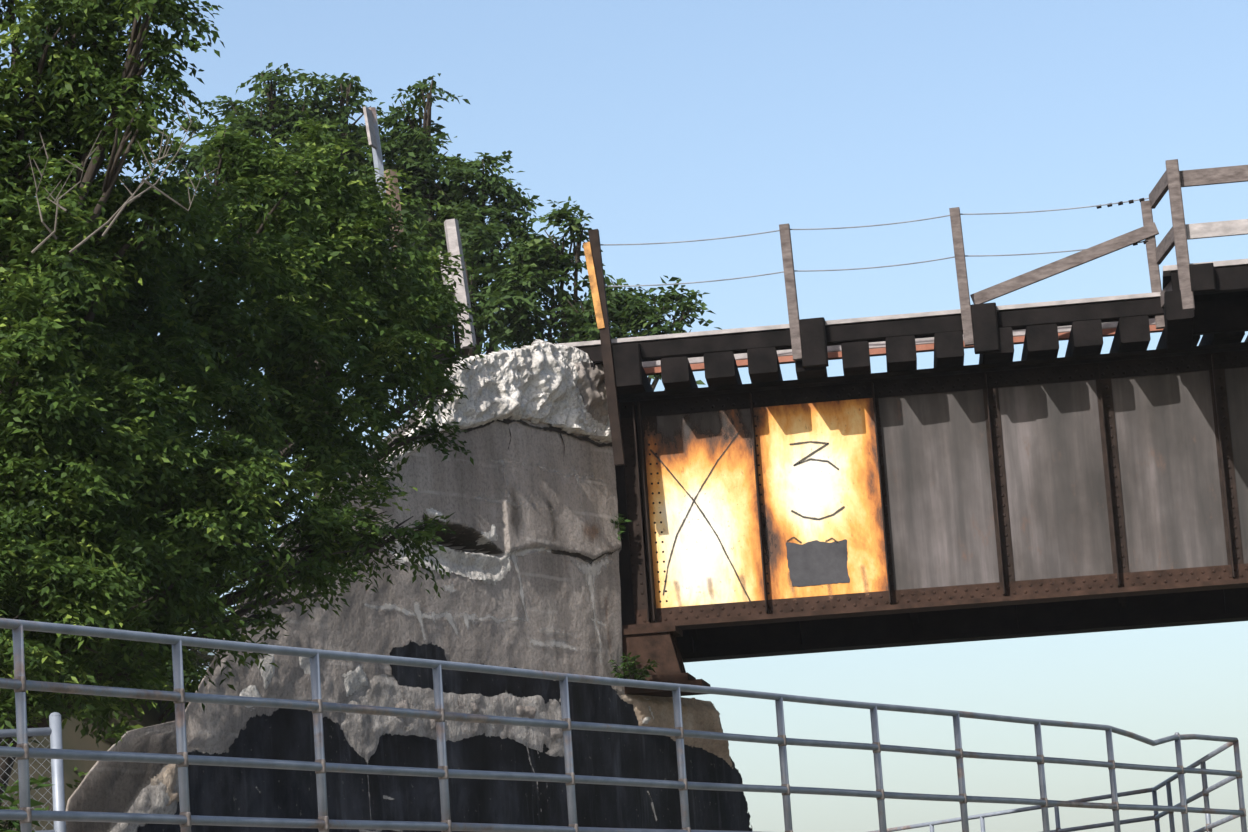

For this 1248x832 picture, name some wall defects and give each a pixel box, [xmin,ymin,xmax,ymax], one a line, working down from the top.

corrosion [643,398,888,608]
spalling [378,508,511,585]
peeling [186,625,564,789]
spalling [621,695,733,769]
peeling [108,764,179,832]